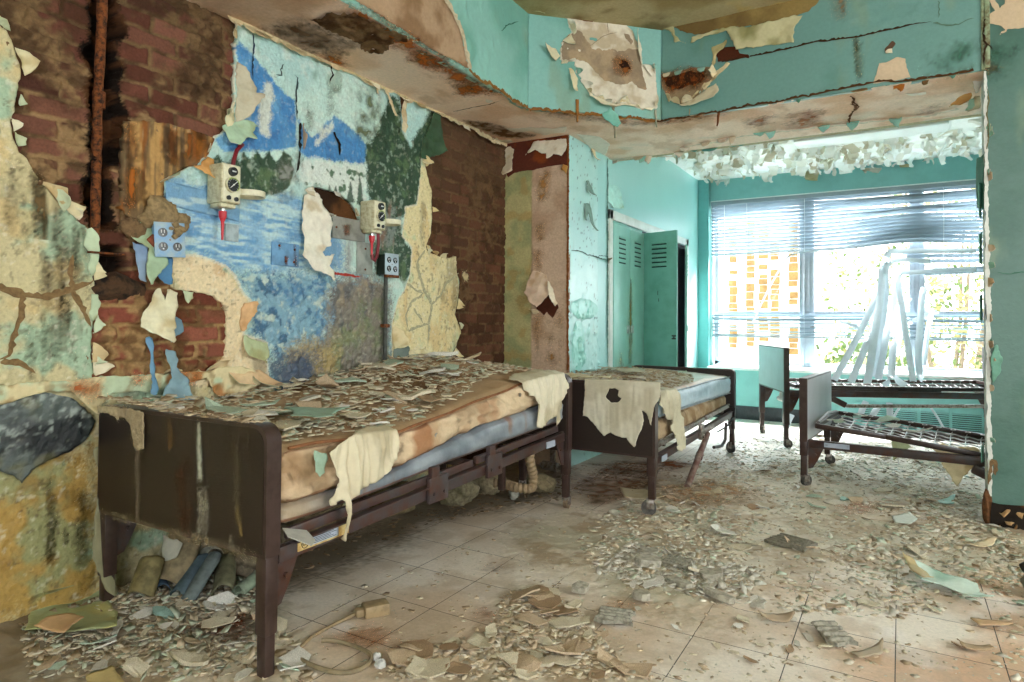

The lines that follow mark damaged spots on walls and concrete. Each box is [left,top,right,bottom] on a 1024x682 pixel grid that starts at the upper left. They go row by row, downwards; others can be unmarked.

crack [252,35,302,173]
peeling [545,15,803,127]
corrosion [353,9,996,138]
crack [722,1,993,149]
peeling [990,0,1024,35]
peeling [665,81,996,322]
crack [0,255,94,373]
flaking render [0,0,569,542]
peeling [988,339,1003,391]
damp [46,504,55,563]
peeling [92,499,118,596]
spalling [982,489,1024,530]